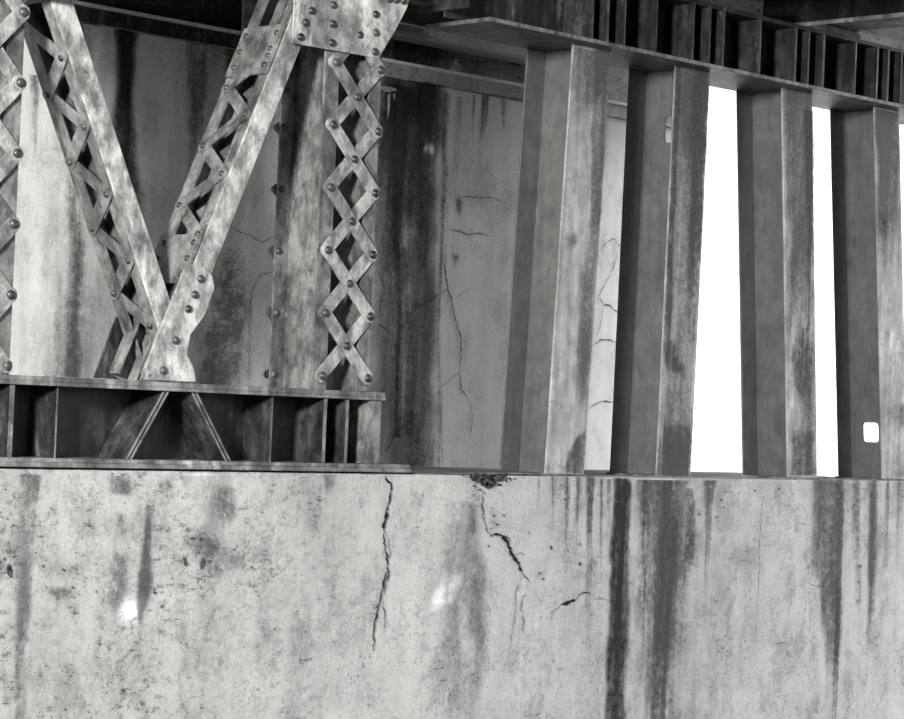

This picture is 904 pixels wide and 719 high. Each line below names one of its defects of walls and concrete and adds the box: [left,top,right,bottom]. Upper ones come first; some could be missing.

damp [375,77,458,467]
damp [16,557,29,678]
damp [137,514,152,621]
crack [372,229,486,652]
spalling [462,473,524,494]
crack [481,488,530,642]
crack [550,591,610,621]
damp [565,477,695,719]
damp [705,480,715,552]
damp [813,478,900,711]